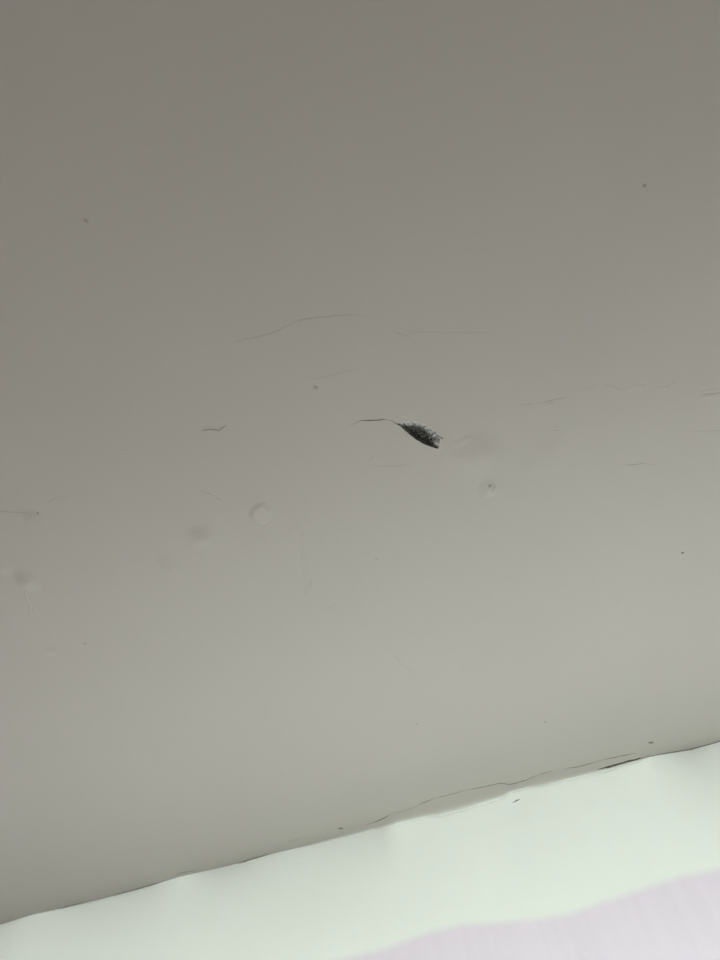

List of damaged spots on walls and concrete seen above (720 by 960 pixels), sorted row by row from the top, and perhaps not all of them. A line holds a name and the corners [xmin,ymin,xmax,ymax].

spalling [396,421,443,449]
crack [368,741,720,825]